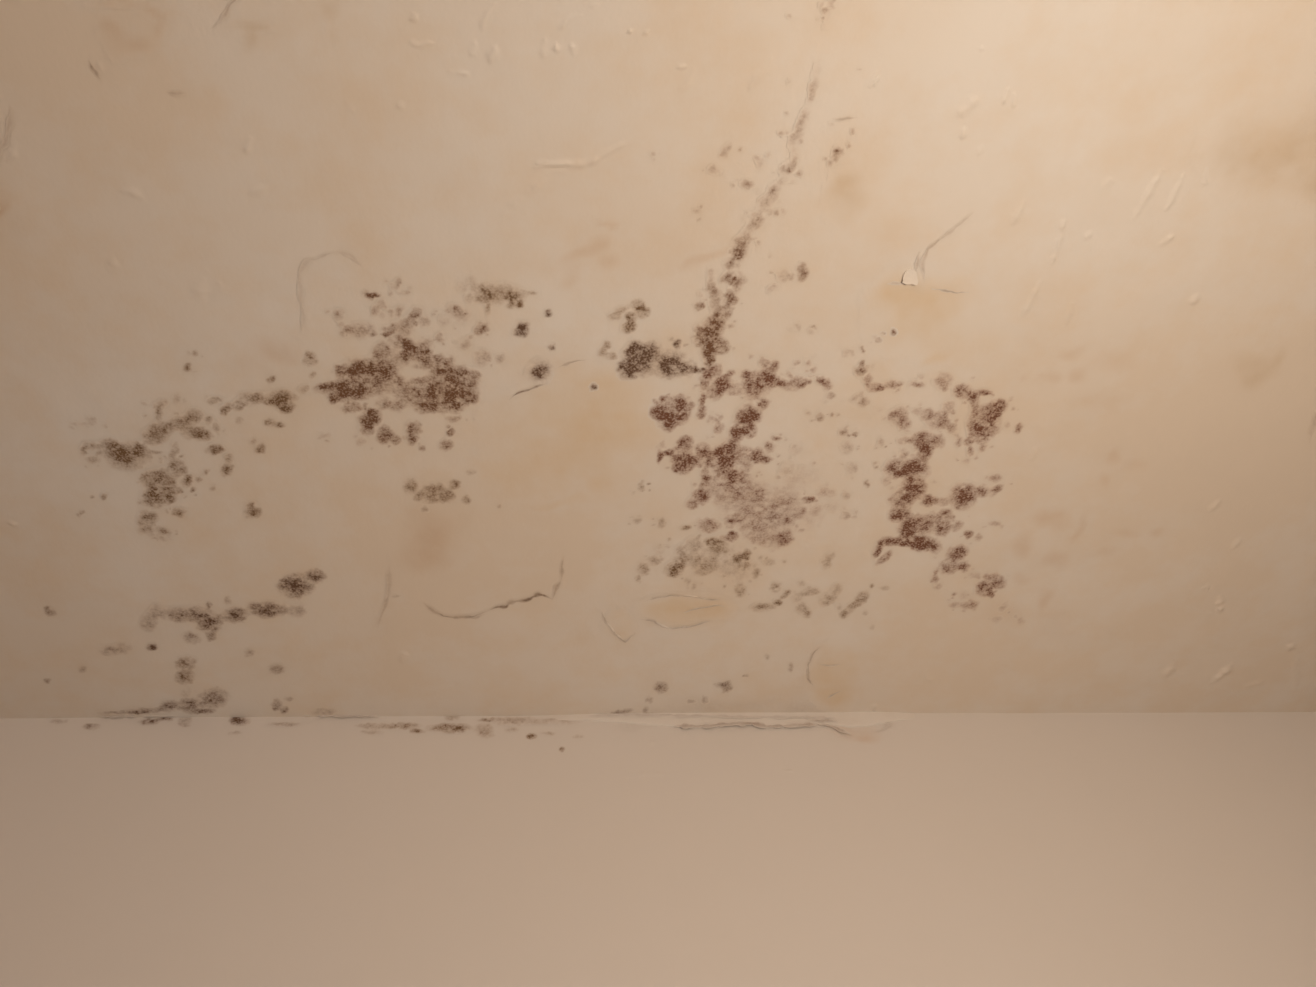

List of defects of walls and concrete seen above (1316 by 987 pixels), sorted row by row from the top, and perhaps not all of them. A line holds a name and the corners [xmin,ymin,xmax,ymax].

crack [887,212,974,294]
damp [67,274,556,542]
damp [597,59,1092,639]
damp [48,567,339,735]
damp [388,468,478,581]
crack [377,556,565,627]